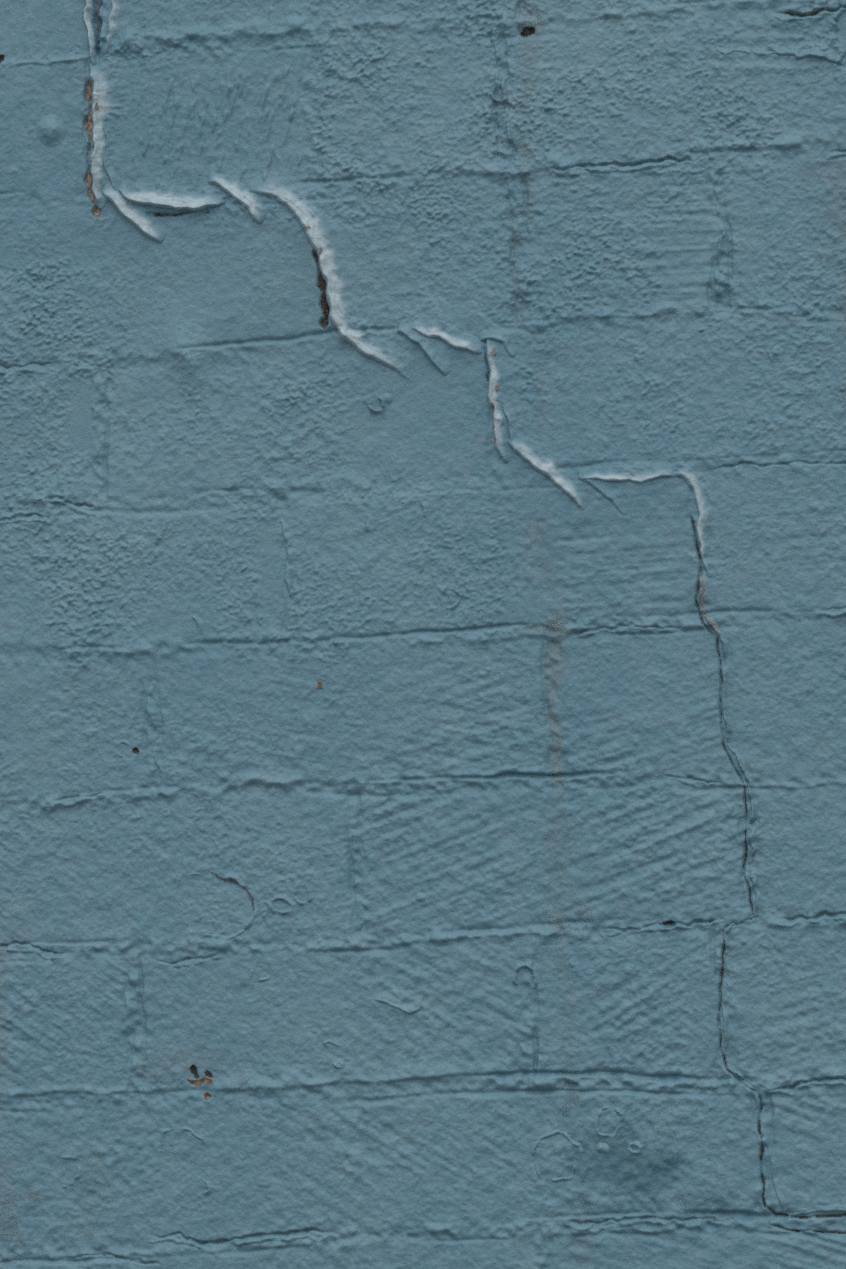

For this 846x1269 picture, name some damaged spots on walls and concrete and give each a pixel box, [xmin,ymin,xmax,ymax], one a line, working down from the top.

crack [775,8,846,22]
crack [553,157,701,178]
crack [83,0,416,380]
crack [397,315,846,1219]
crack [157,955,223,968]
crack [565,1216,734,1232]